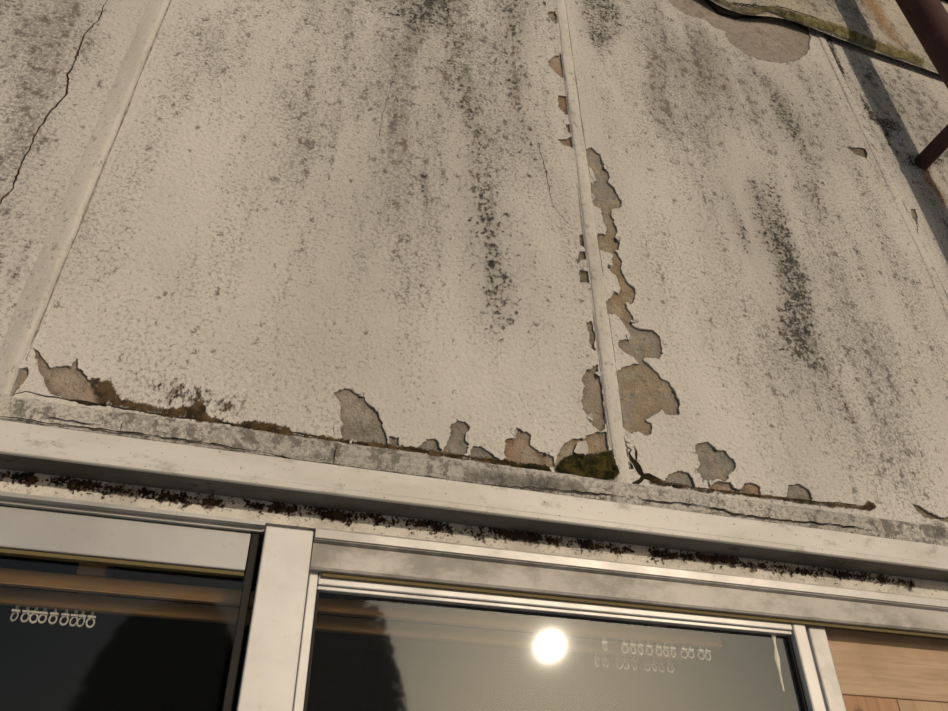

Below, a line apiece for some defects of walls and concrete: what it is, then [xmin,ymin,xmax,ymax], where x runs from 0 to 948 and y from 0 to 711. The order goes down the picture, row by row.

spalling [668,0,811,64]
crack [0,0,107,205]
mould [488,0,550,183]
peeling [548,56,565,78]
peeling [558,97,572,147]
mould [378,0,536,341]
spalling [419,148,679,468]
mould [732,162,838,391]
spalling [13,350,106,406]
spalling [334,389,398,447]
spalling [665,443,760,498]
spalling [785,484,811,500]